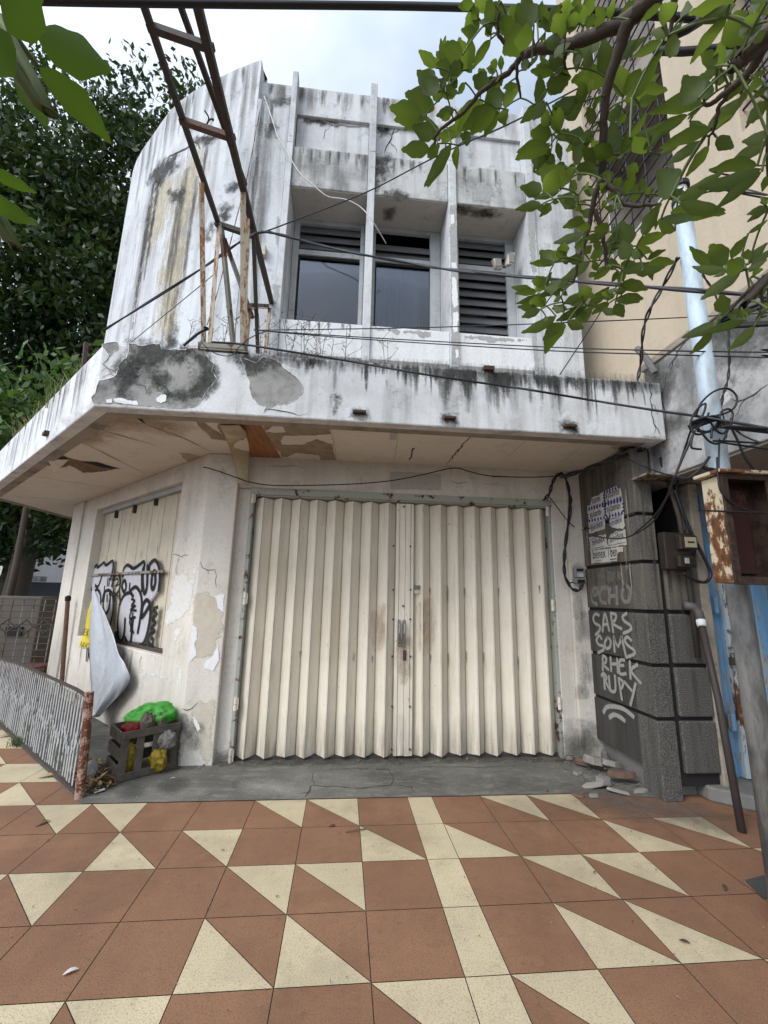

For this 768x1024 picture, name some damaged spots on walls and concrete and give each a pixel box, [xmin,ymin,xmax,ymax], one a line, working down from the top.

leakage [327,152,421,202]
leakage [135,142,207,347]
peeling [91,339,219,409]
peeling [197,422,238,441]
peeling [236,354,336,460]
leakage [233,352,672,411]
peeling [165,564,224,671]